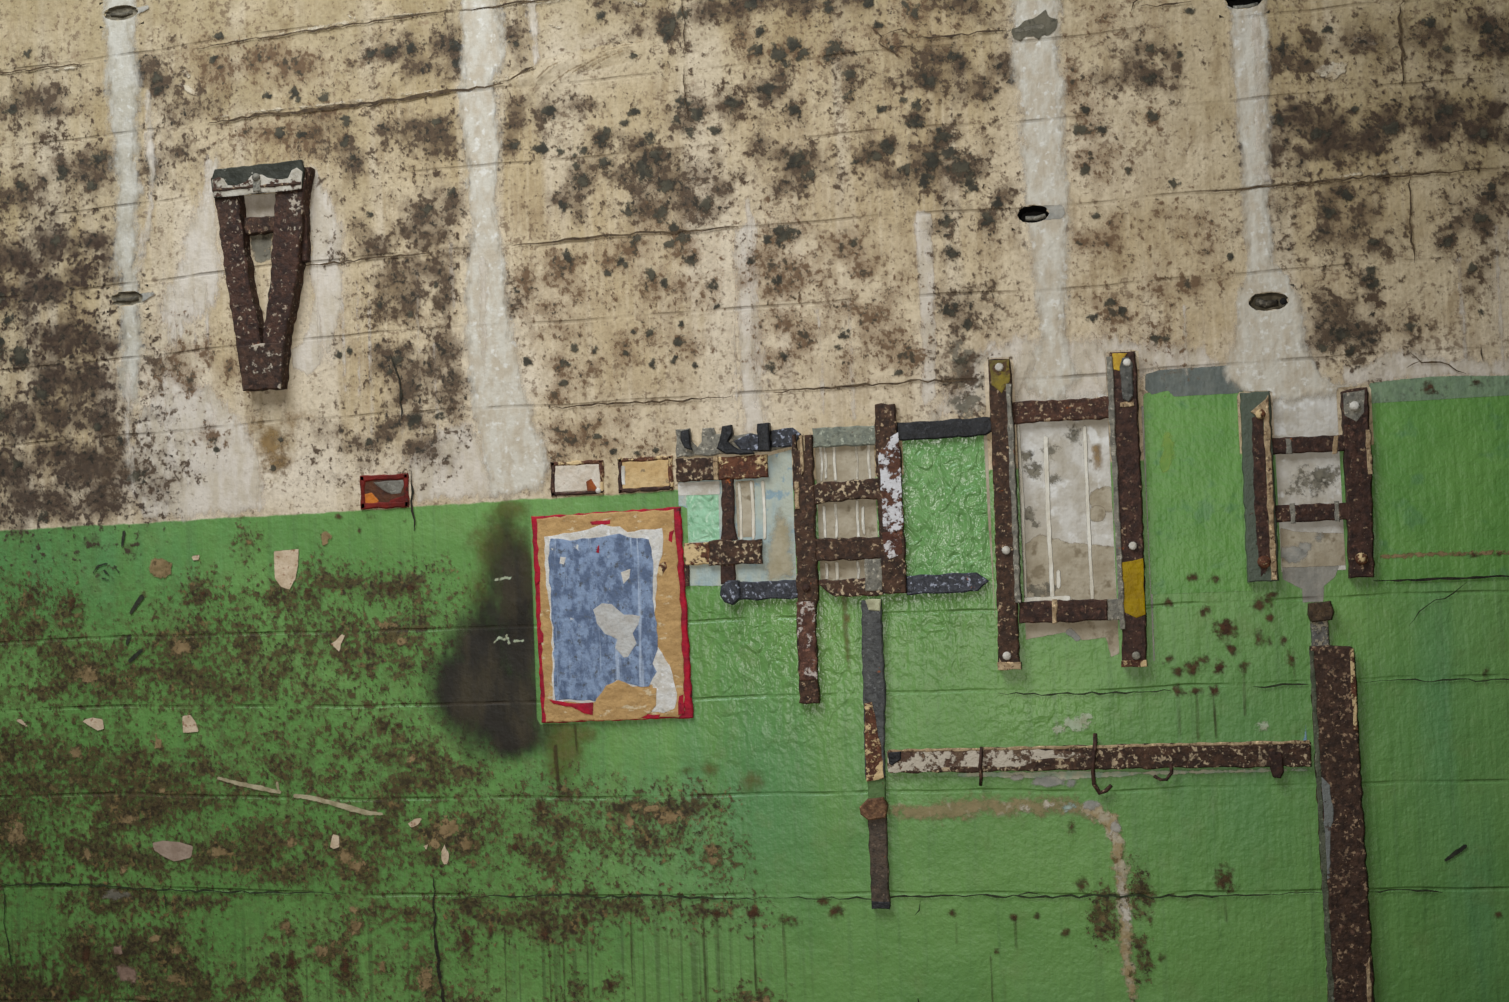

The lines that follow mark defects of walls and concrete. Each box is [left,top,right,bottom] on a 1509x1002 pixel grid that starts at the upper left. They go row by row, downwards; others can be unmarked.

water stain [0,3,528,577]
water stain [488,0,1244,484]
water stain [1260,0,1509,385]
water stain [735,480,793,580]
water stain [1025,506,1038,527]
corrosion [1252,416,1271,576]
corrosion [1165,608,1249,722]
corrosion [1253,592,1294,666]
peeling [0,516,782,1002]